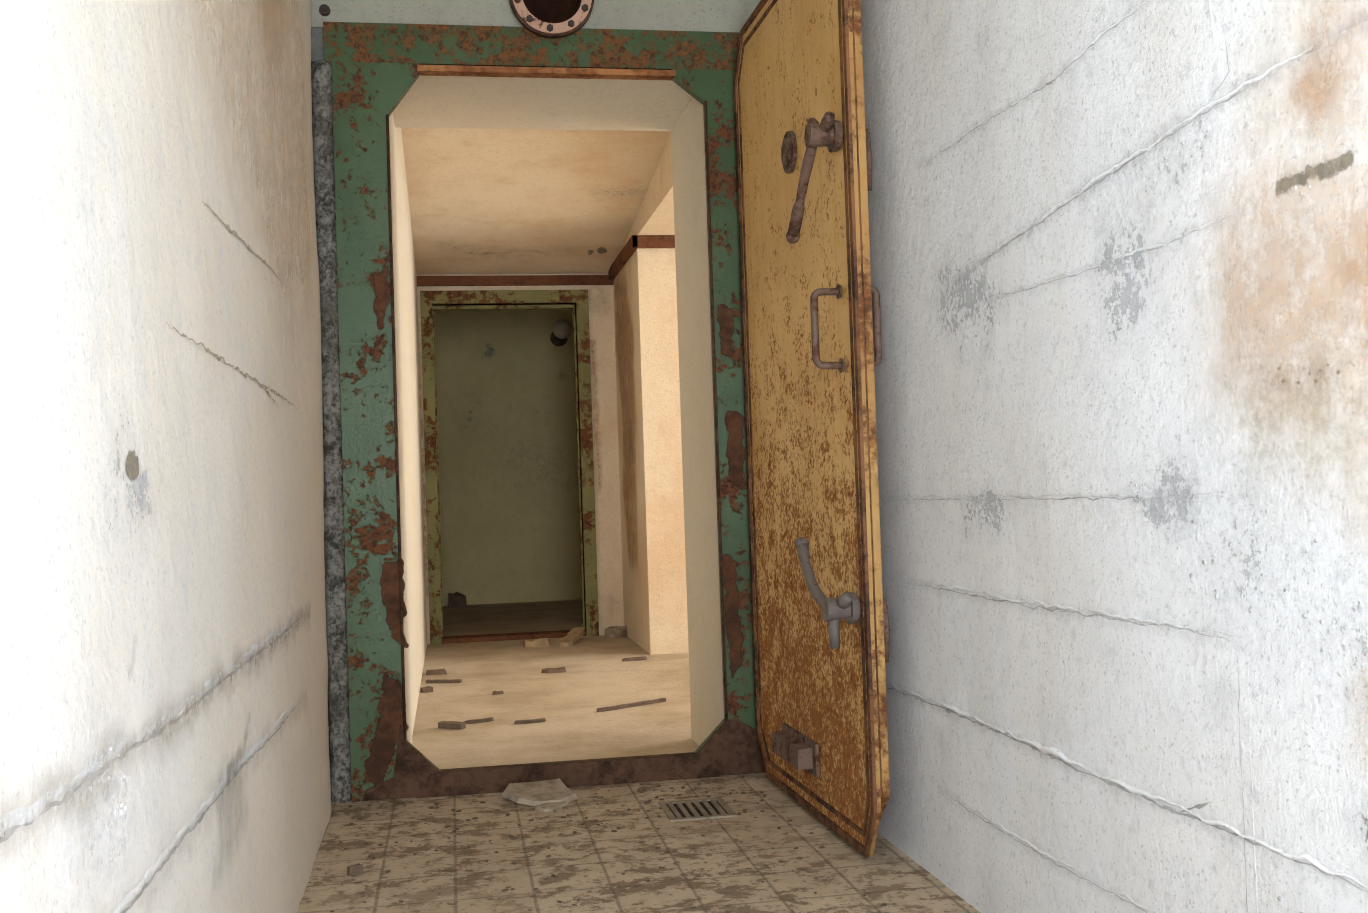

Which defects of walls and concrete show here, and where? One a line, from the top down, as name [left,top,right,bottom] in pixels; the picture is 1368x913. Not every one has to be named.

crack [919,0,1150,168]
crack [952,14,1368,302]
peeling [373,266,391,330]
peeling [717,304,734,358]
peeling [724,411,747,490]
peeling [380,558,409,648]
peeling [722,554,744,678]
crack [0,603,310,843]
crack [113,686,306,913]
peeling [364,674,409,786]
crack [886,579,1368,913]